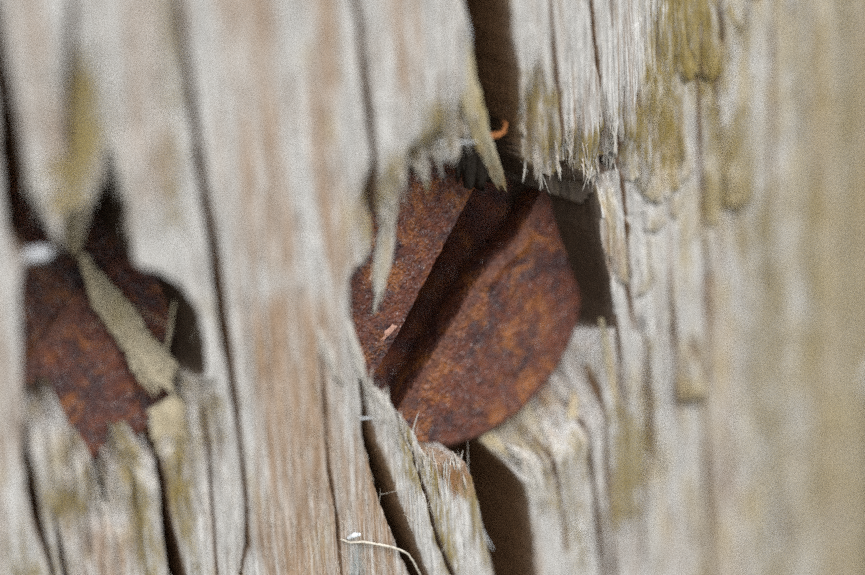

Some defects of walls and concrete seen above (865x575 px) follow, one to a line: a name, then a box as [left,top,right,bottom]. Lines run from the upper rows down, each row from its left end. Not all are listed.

crack [0,18,27,260]
crack [462,0,524,150]
crack [174,0,251,575]
crack [142,421,186,575]
crack [358,379,455,575]
crack [438,437,537,575]